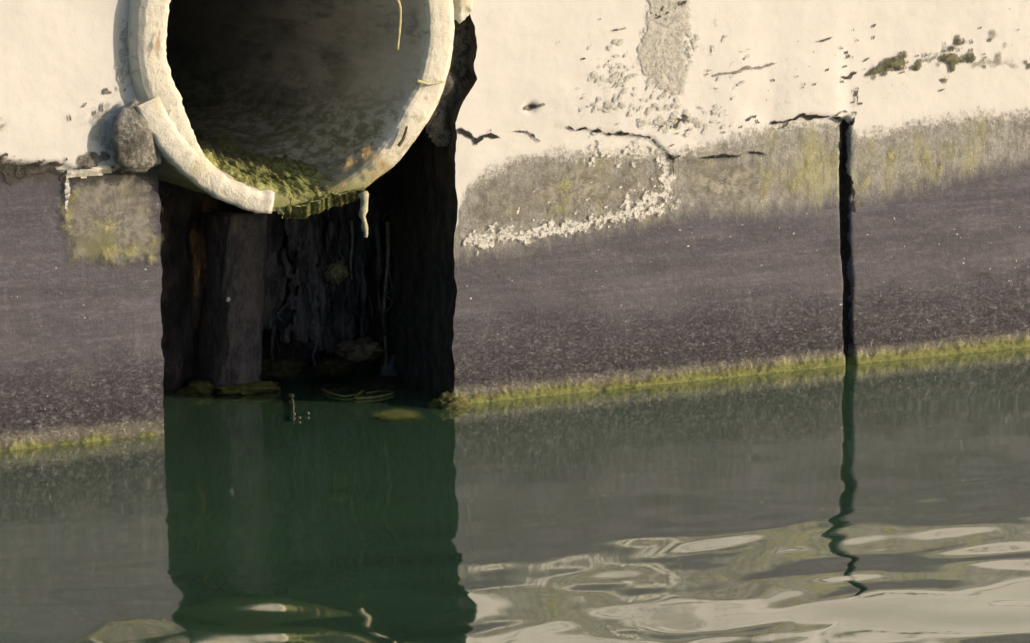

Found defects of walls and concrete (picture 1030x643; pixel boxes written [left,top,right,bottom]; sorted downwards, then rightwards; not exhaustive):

peeling [577,0,760,152]
water stain [973,27,1014,67]
spalling [78,151,110,169]
water stain [463,138,760,255]
crack [568,126,765,174]
crack [772,96,858,364]